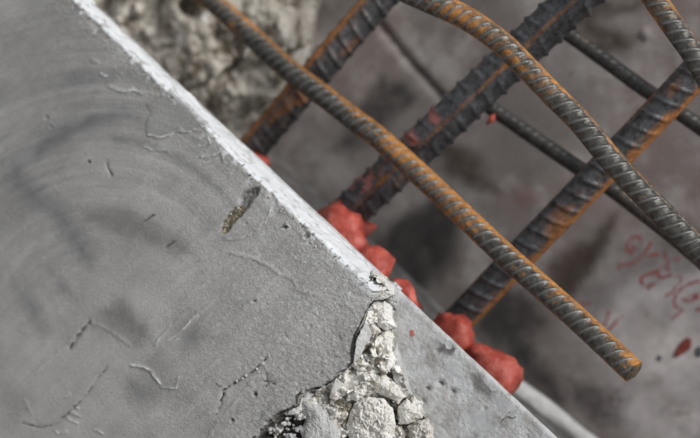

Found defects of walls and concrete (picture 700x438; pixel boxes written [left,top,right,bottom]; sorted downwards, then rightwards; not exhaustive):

spalling [93,0,700,382]
crack [253,389,303,438]
spalling [261,270,434,438]
crack [337,299,383,373]